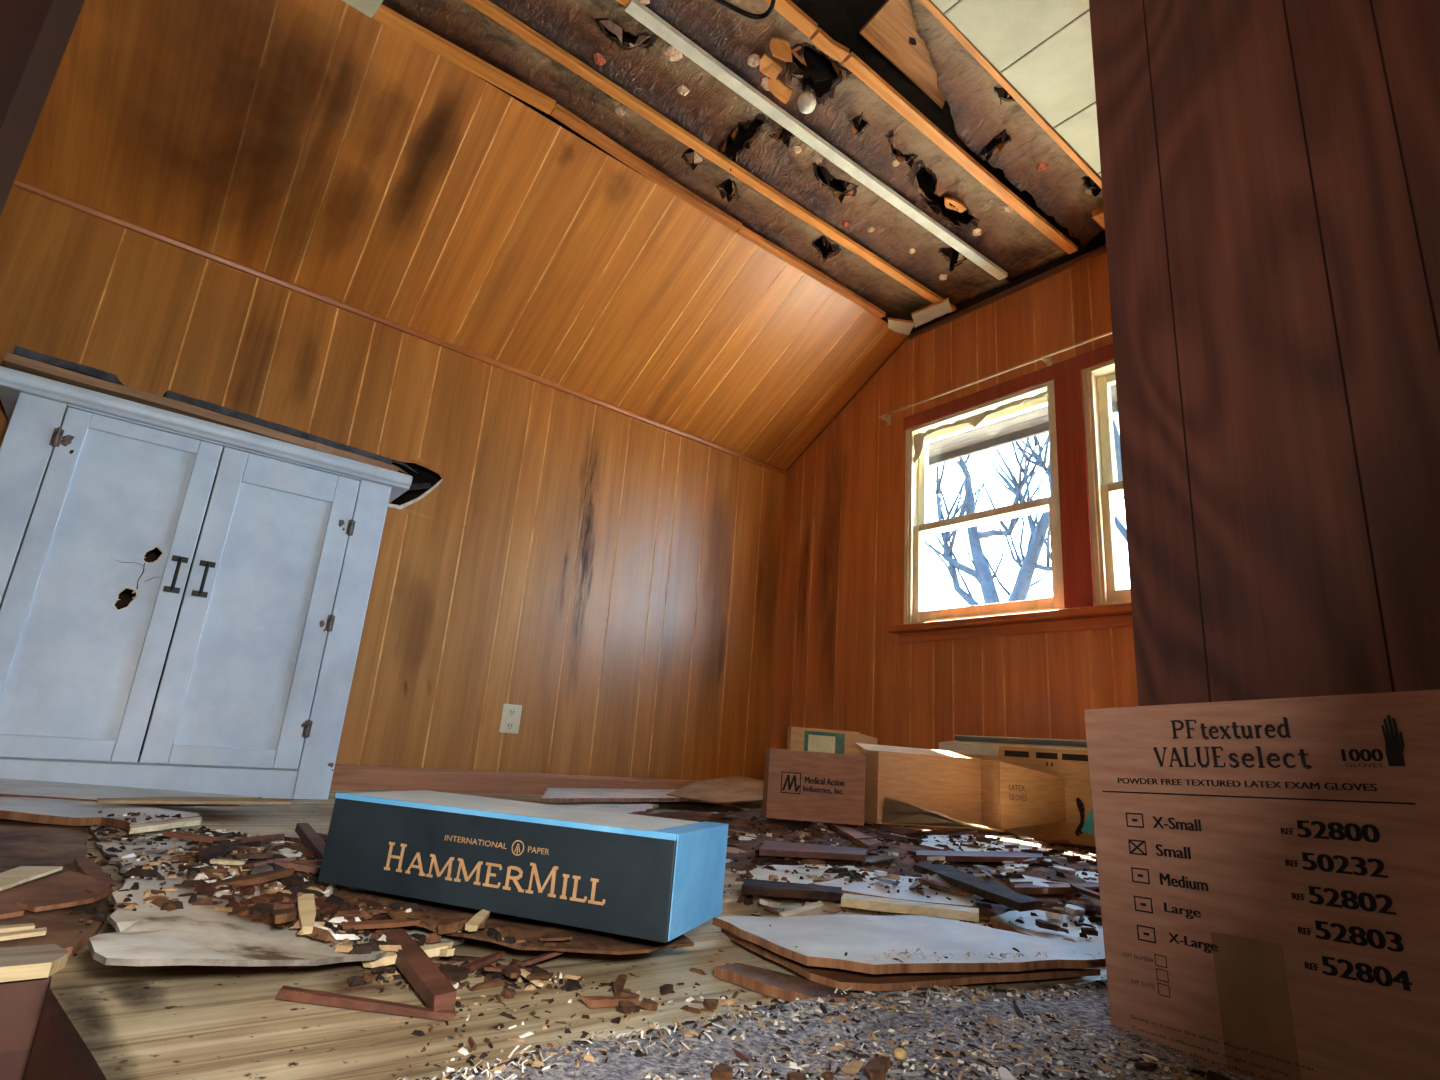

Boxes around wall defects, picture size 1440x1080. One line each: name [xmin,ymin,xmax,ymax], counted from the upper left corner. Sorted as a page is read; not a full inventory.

water stain [168,0,323,185]
water stain [408,110,451,200]
water stain [565,458,596,635]